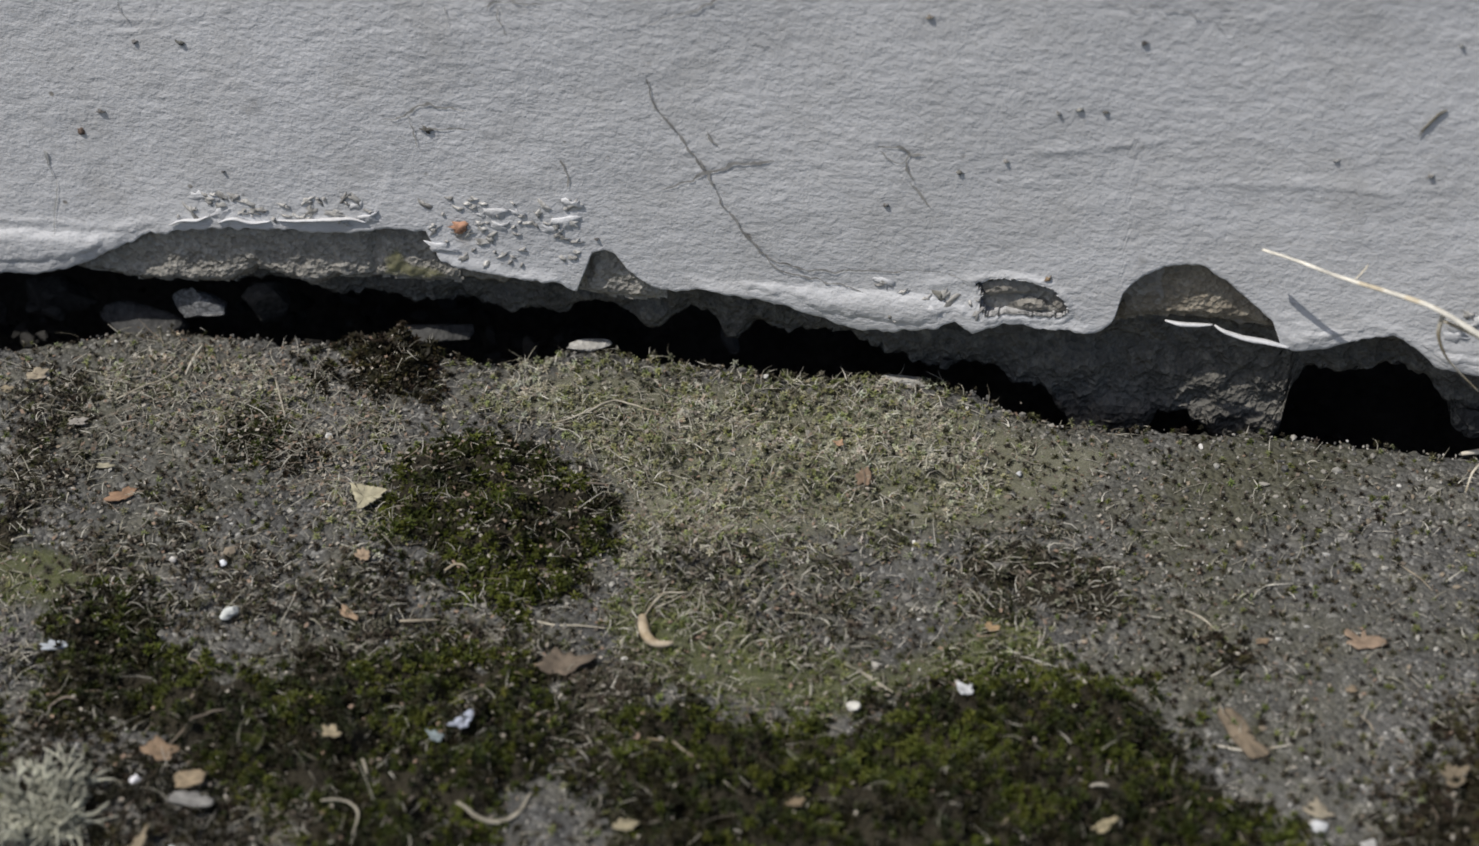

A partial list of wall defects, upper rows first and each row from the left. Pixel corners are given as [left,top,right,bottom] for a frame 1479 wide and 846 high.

crack [646,79,966,293]
spalling [79,190,667,300]
peeling [872,277,985,321]
spalling [1114,264,1289,349]
peeling [1443,310,1479,343]